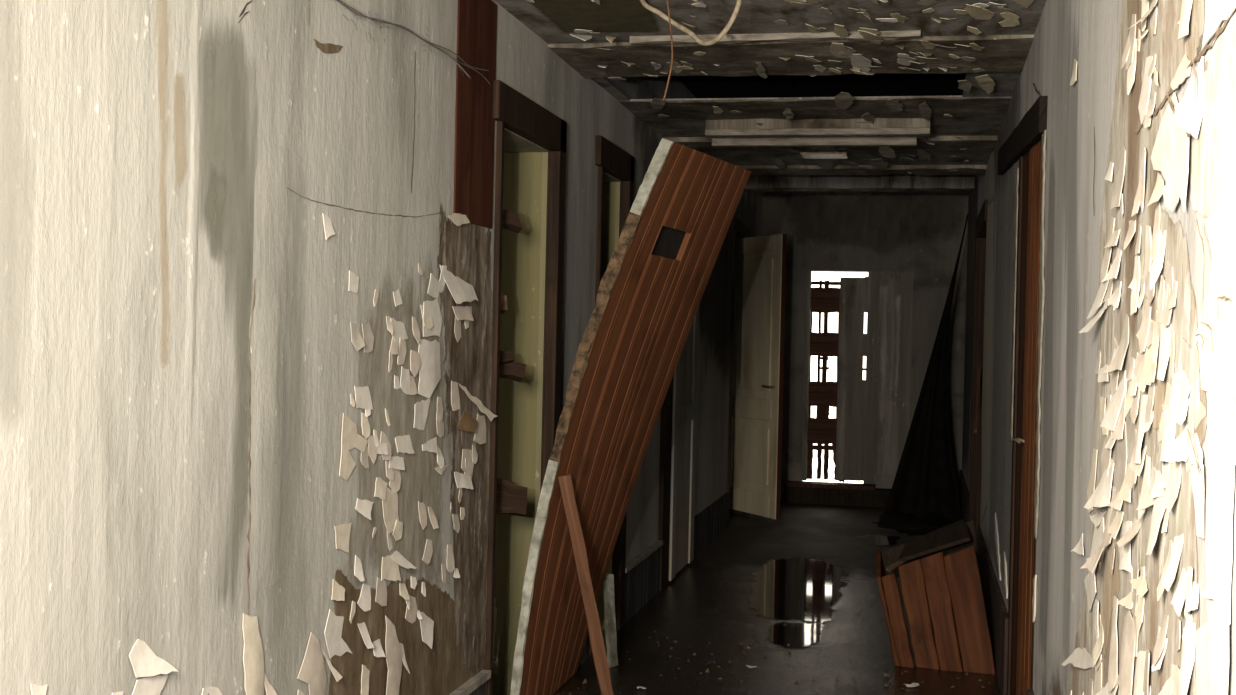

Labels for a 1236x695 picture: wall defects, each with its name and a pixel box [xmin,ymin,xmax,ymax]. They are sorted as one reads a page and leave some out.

peeling [681,0,706,30]
peeling [570,29,720,81]
peeling [779,0,1034,94]
peeling [834,92,854,109]
peeling [774,136,968,174]
flaking render [1053,0,1236,695]
spalling [297,204,499,695]
peeling [30,684,48,695]
peeling [112,639,179,695]
peeling [202,686,223,695]
peeling [242,614,277,695]